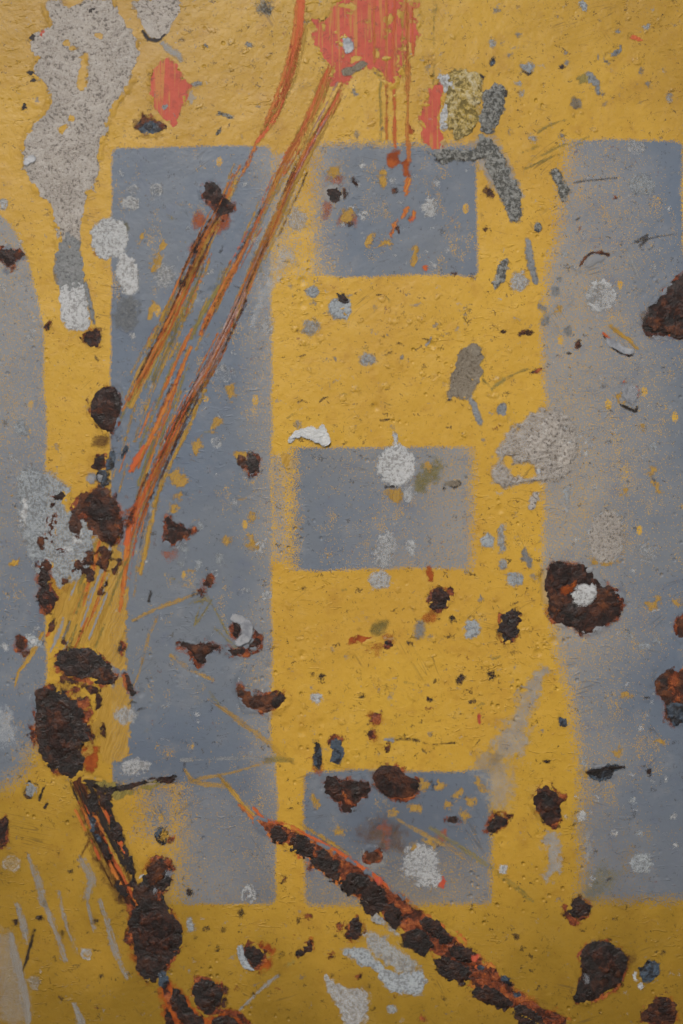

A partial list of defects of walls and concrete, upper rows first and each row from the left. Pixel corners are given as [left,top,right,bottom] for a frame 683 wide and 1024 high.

peeling [15,0,202,332]
corrosion [636,274,683,342]
peeling [496,401,512,423]
peeling [8,465,122,608]
peeling [25,633,44,648]
corrosion [534,555,628,638]
corrosion [26,383,264,1024]
corrosion [648,664,683,730]
corrosion [252,710,639,1024]
peeling [341,926,429,1014]